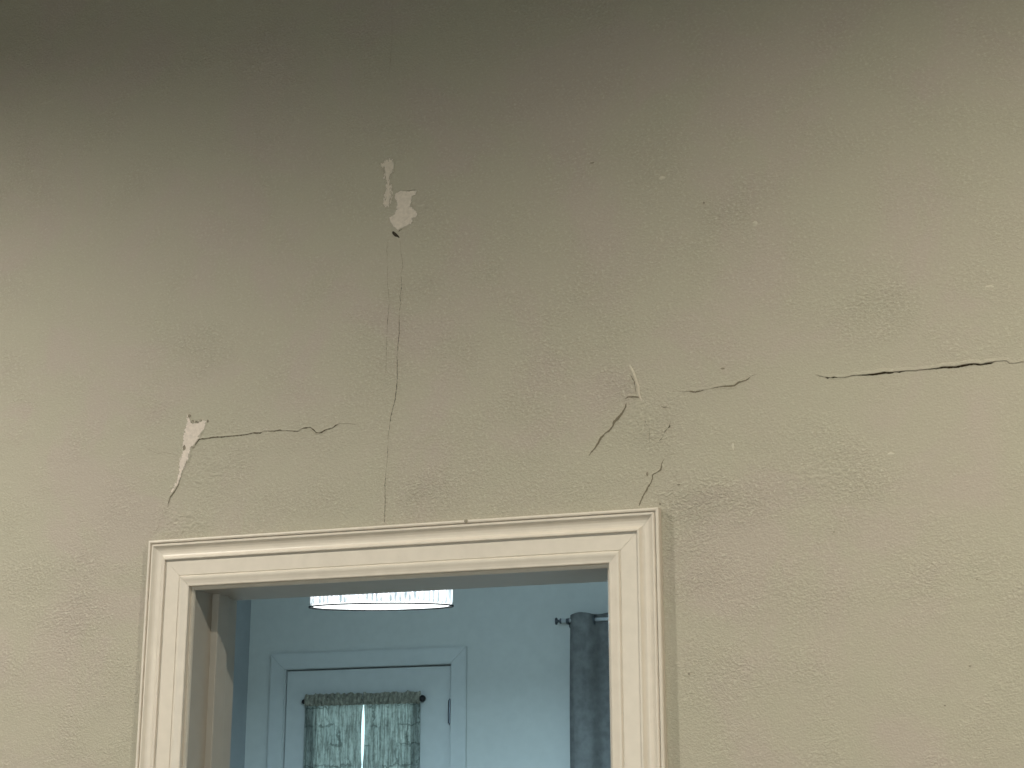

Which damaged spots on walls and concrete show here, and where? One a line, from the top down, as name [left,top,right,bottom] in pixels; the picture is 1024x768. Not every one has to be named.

peeling [381,157,420,238]
crack [816,357,1024,380]
peeling [170,414,208,492]
crack [167,422,361,508]
crack [587,372,758,506]